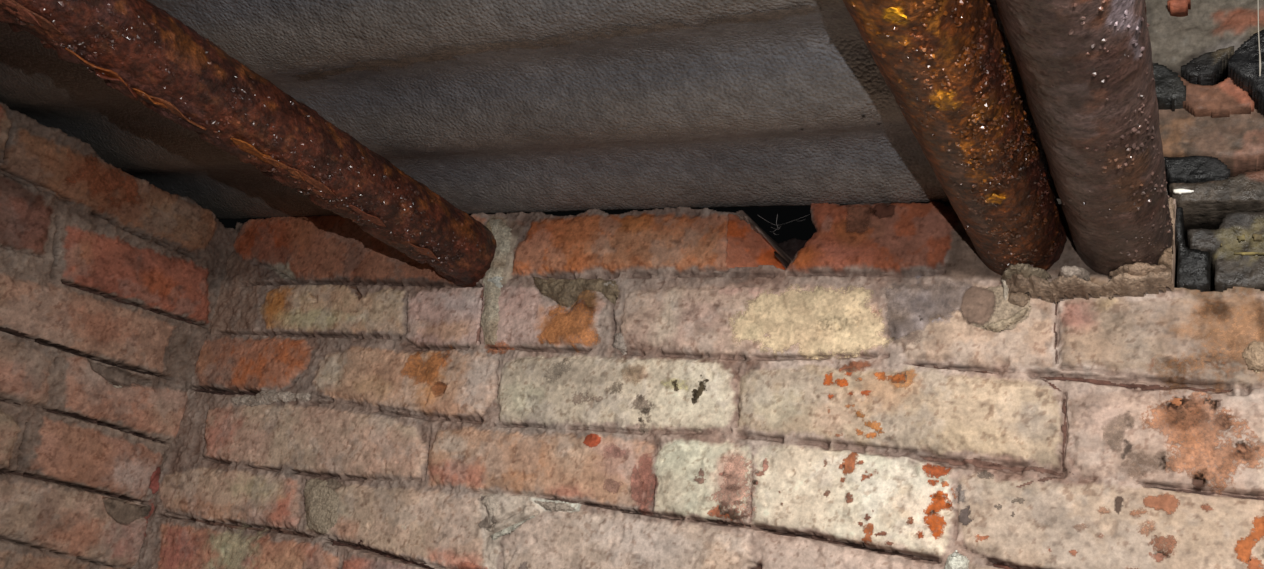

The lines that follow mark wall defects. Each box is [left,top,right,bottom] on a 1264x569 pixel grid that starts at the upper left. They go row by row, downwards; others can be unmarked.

corrosion [0,0,42,28]
corrosion [884,7,907,22]
corrosion [65,48,206,130]
corrosion [230,137,337,197]
corrosion [987,193,1007,204]